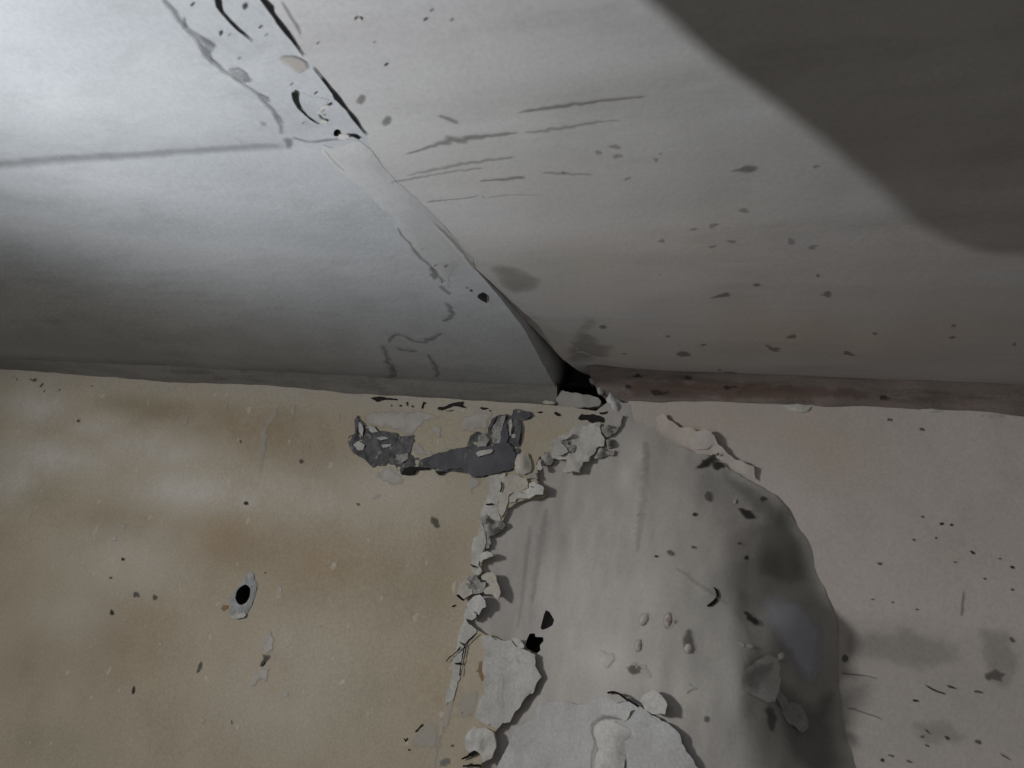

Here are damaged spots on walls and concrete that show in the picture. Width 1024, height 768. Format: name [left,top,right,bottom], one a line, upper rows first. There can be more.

crack [215,0,252,42]
crack [260,0,367,140]
flaking render [348,409,698,768]